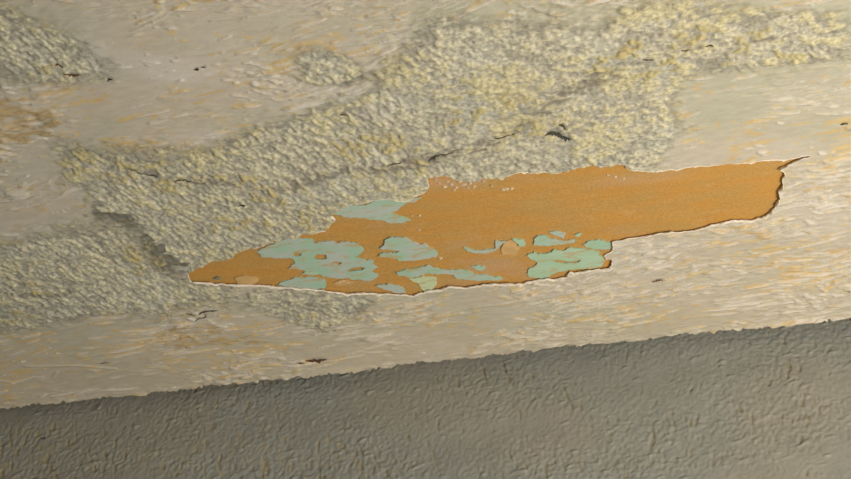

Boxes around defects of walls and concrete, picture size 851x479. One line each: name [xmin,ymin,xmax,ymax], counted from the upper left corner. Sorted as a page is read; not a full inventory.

peeling [187,155,811,298]